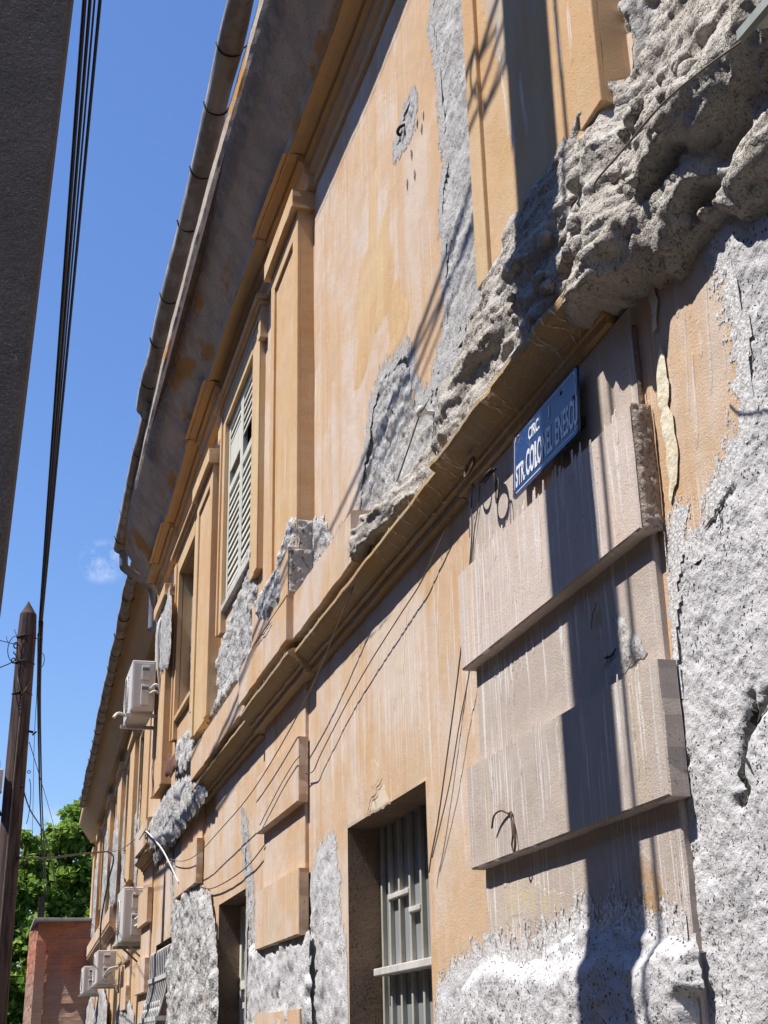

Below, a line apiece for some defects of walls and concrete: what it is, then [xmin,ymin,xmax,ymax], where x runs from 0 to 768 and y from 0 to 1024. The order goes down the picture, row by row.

spalling [617,0,663,69]
spalling [85,0,481,1024]
spalling [434,213,768,1024]
crack [737,695,768,806]